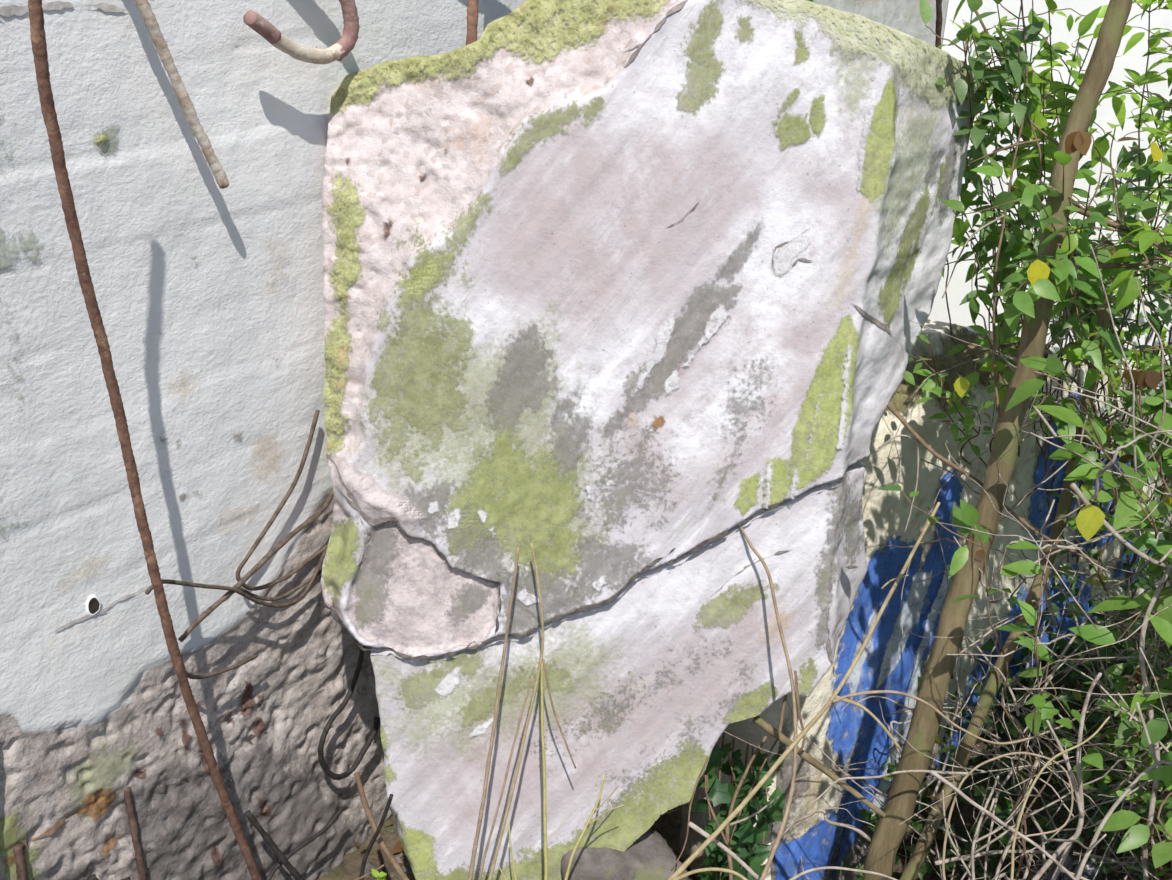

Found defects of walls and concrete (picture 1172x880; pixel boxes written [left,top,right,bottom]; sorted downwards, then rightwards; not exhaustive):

spalling [0,0,498,880]
crack [322,455,867,677]
peeling [517,589,539,606]
corrosion [225,681,266,738]
corrosion [179,719,210,774]